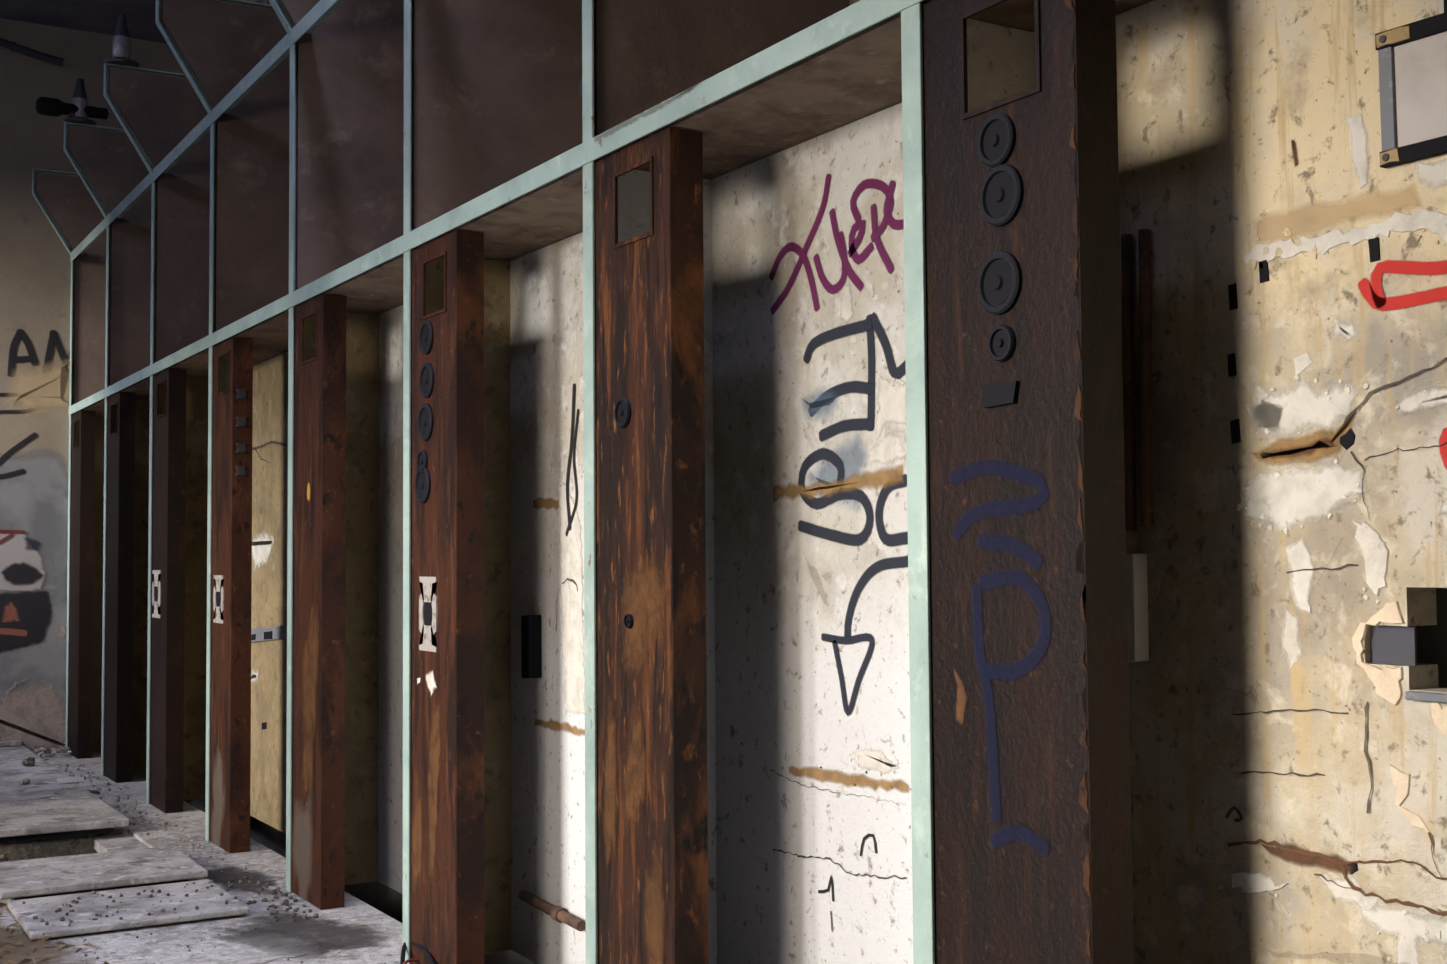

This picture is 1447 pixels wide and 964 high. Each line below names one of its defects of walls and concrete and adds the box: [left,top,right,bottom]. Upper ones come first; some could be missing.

peeling [1334,319,1357,340]
crack [1343,357,1447,517]
peeling [1395,388,1447,416]
peeling [1237,353,1370,667]
crack [1286,564,1359,573]
flaking render [1351,520,1405,706]
crack [1232,702,1372,814]
flaking render [1430,702,1447,736]
crack [1225,771,1447,916]